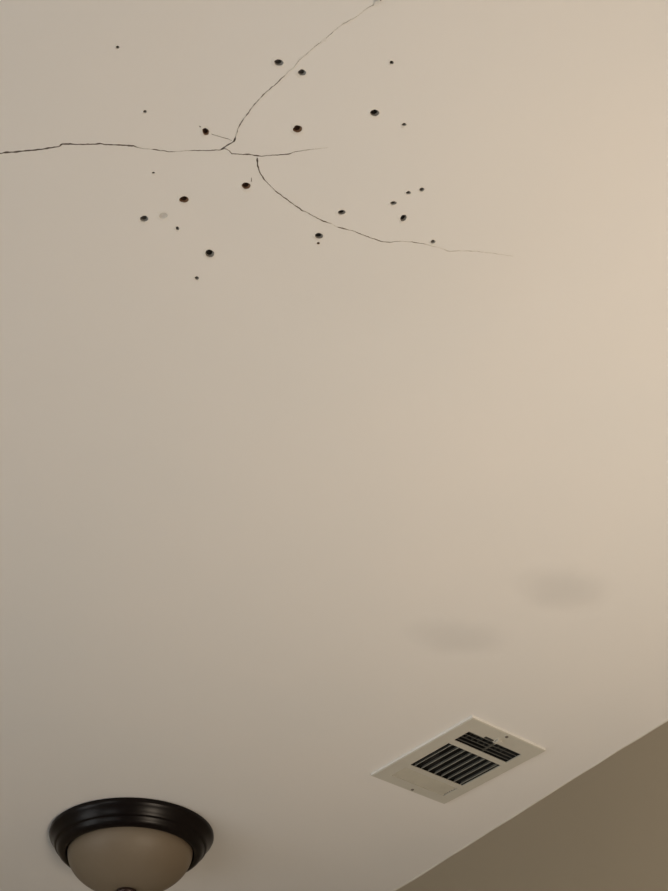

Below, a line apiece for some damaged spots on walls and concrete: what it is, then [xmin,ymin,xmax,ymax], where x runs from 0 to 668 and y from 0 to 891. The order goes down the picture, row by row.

crack [0,0,513,257]